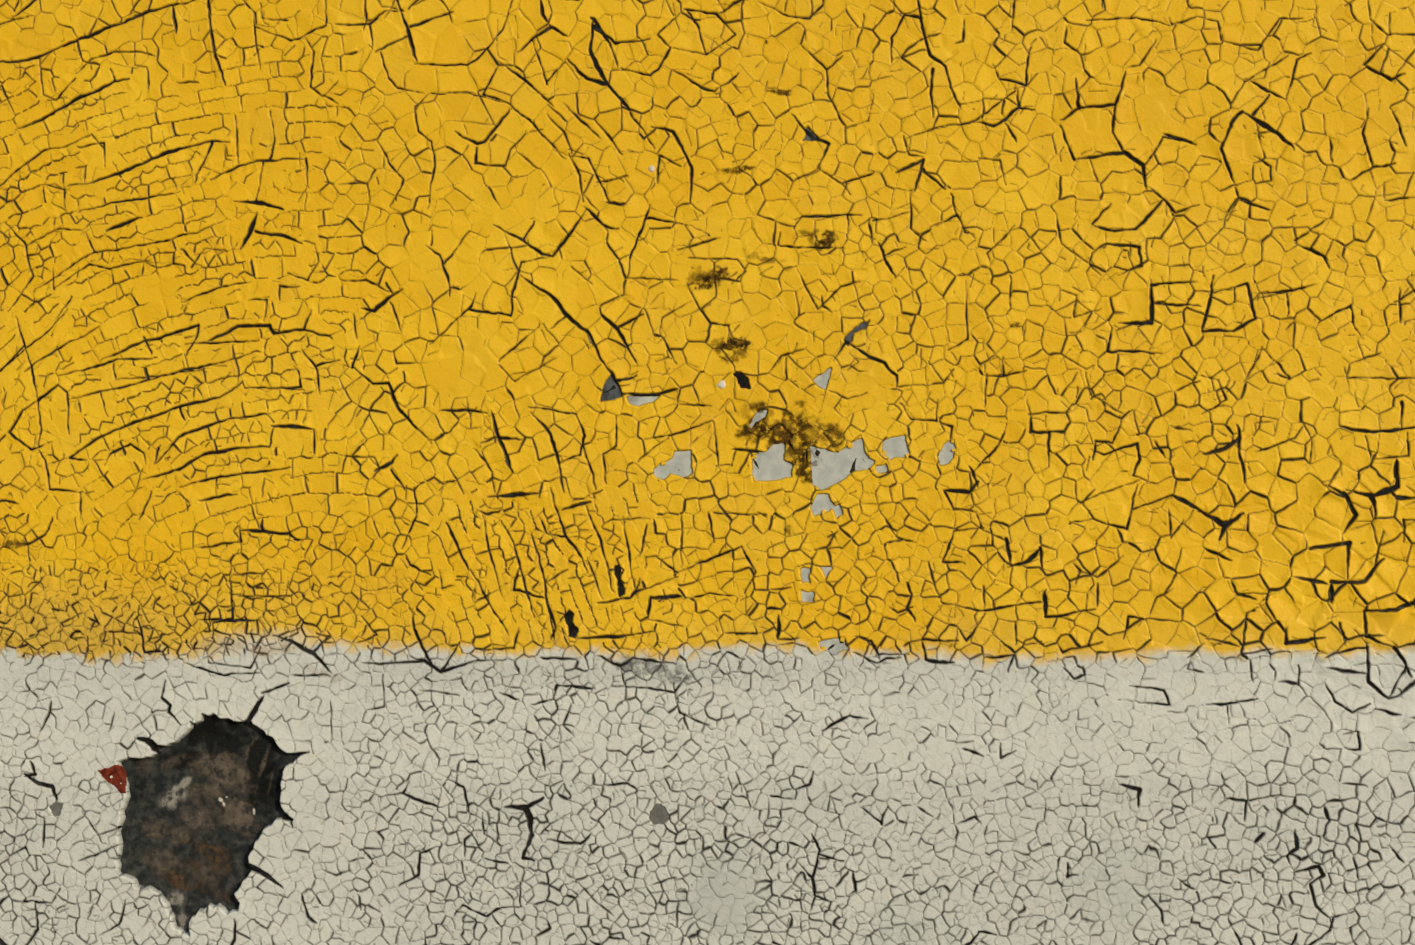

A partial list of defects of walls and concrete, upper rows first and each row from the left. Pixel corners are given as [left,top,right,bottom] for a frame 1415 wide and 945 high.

crack [1364,8,1415,81]
crack [1064,0,1406,210]
crack [773,0,1031,308]
peeling [601,375,659,406]
spalling [733,372,750,389]
crack [839,340,953,431]
peeling [654,450,693,479]
peeling [751,443,793,482]
peeling [810,435,910,517]
crack [845,392,1115,679]
crack [1057,98,1415,945]
spalling [98,715,300,932]